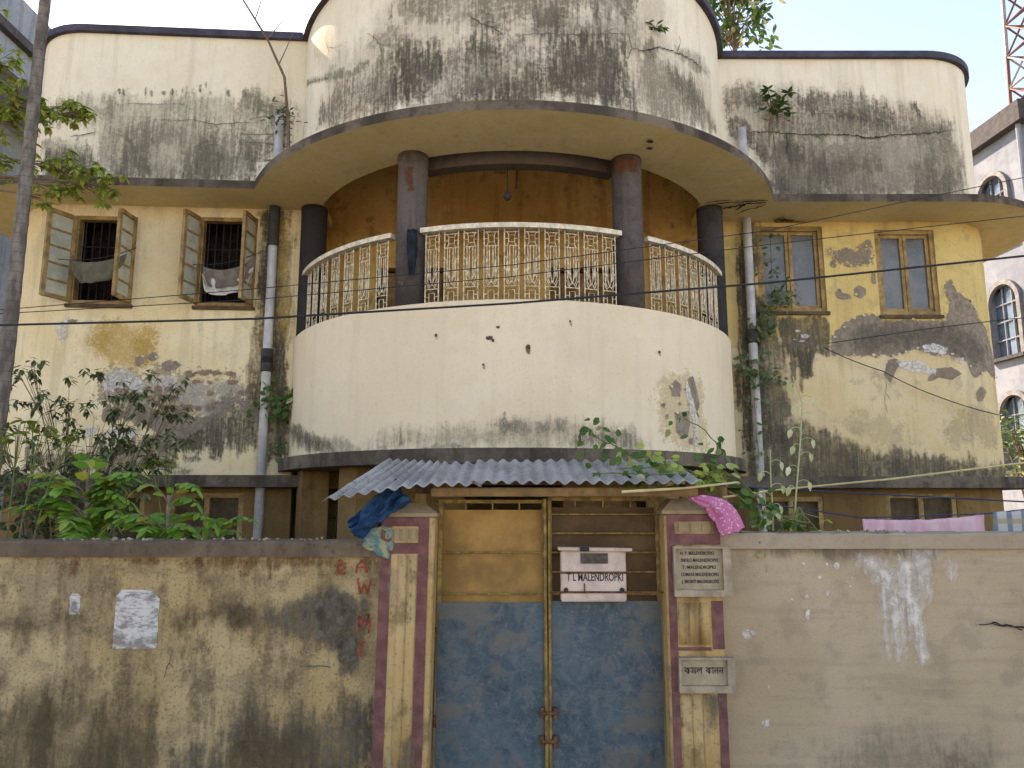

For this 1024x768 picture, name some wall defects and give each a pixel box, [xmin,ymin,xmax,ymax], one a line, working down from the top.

leakage [370,0,768,157]
leakage [41,83,290,181]
crack [750,113,954,154]
leakage [771,95,963,194]
peeling [828,240,876,299]
flaking render [85,352,259,442]
peeling [661,376,700,446]
leakage [736,222,1007,477]
flaking render [830,279,998,402]
leakage [208,588,369,676]
efflorescence [864,558,928,662]
crack [979,622,1024,630]